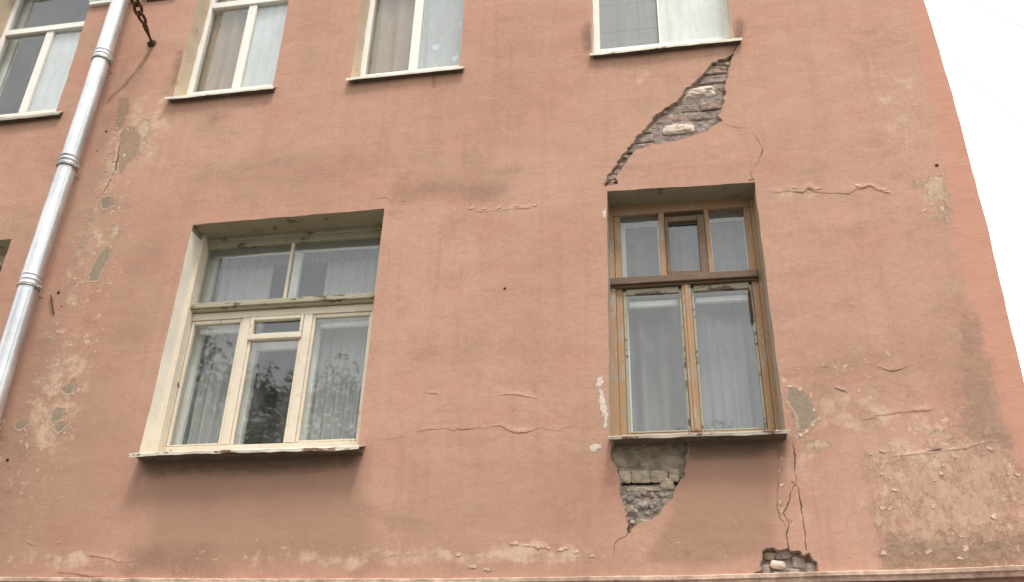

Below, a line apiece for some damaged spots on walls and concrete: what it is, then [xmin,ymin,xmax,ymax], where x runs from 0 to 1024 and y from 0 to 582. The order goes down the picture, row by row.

flaking render [604,53,734,187]
peeling [94,101,150,211]
peeling [87,225,121,282]
crack [377,422,599,440]
peeling [594,376,609,428]
peeling [783,385,828,450]
crack [860,404,933,420]
flaking render [589,443,689,532]
crack [777,416,807,550]
peeling [868,439,1002,510]
flaking render [754,547,819,573]